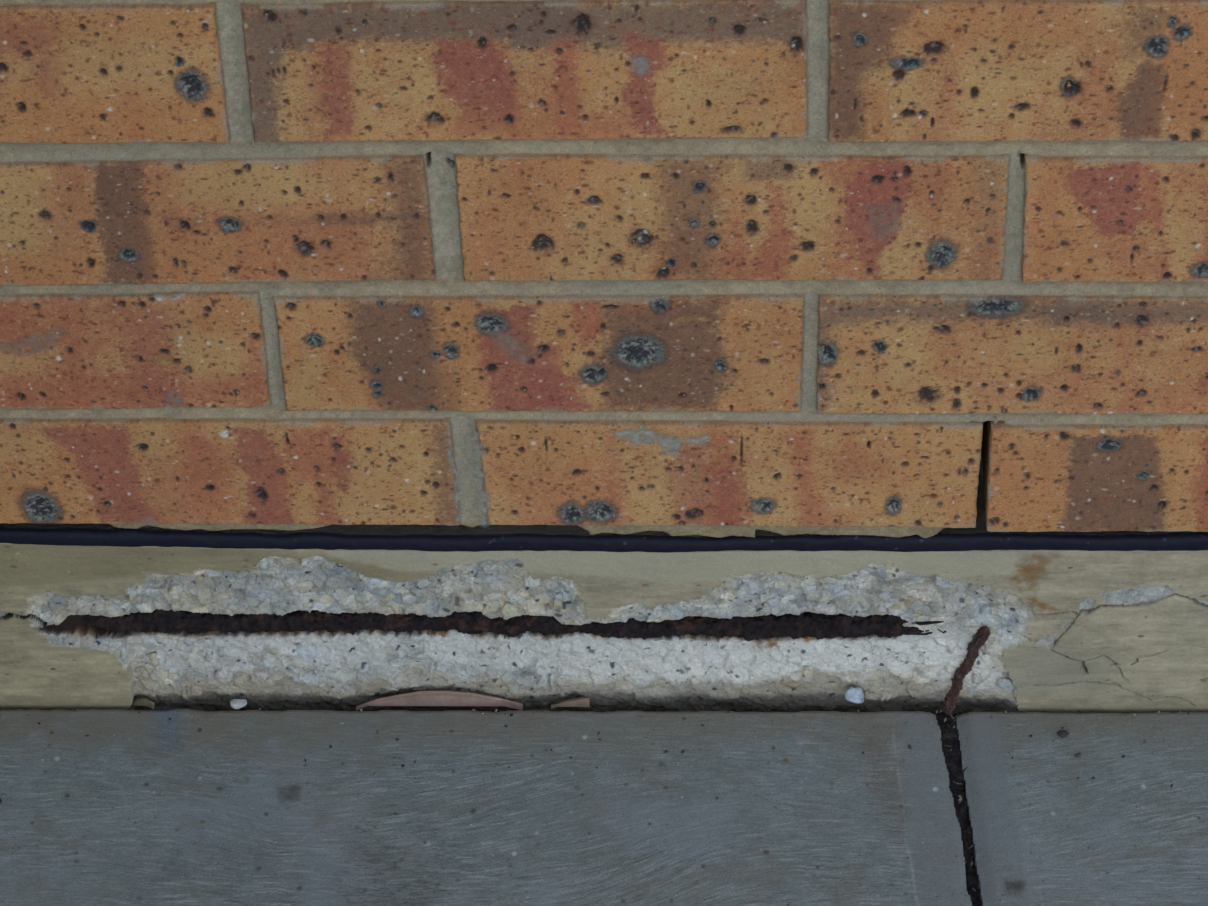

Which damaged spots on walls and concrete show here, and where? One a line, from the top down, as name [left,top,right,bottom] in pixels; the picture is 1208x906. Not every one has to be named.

spalling [25,555,1036,716]
crack [1034,585,1208,704]